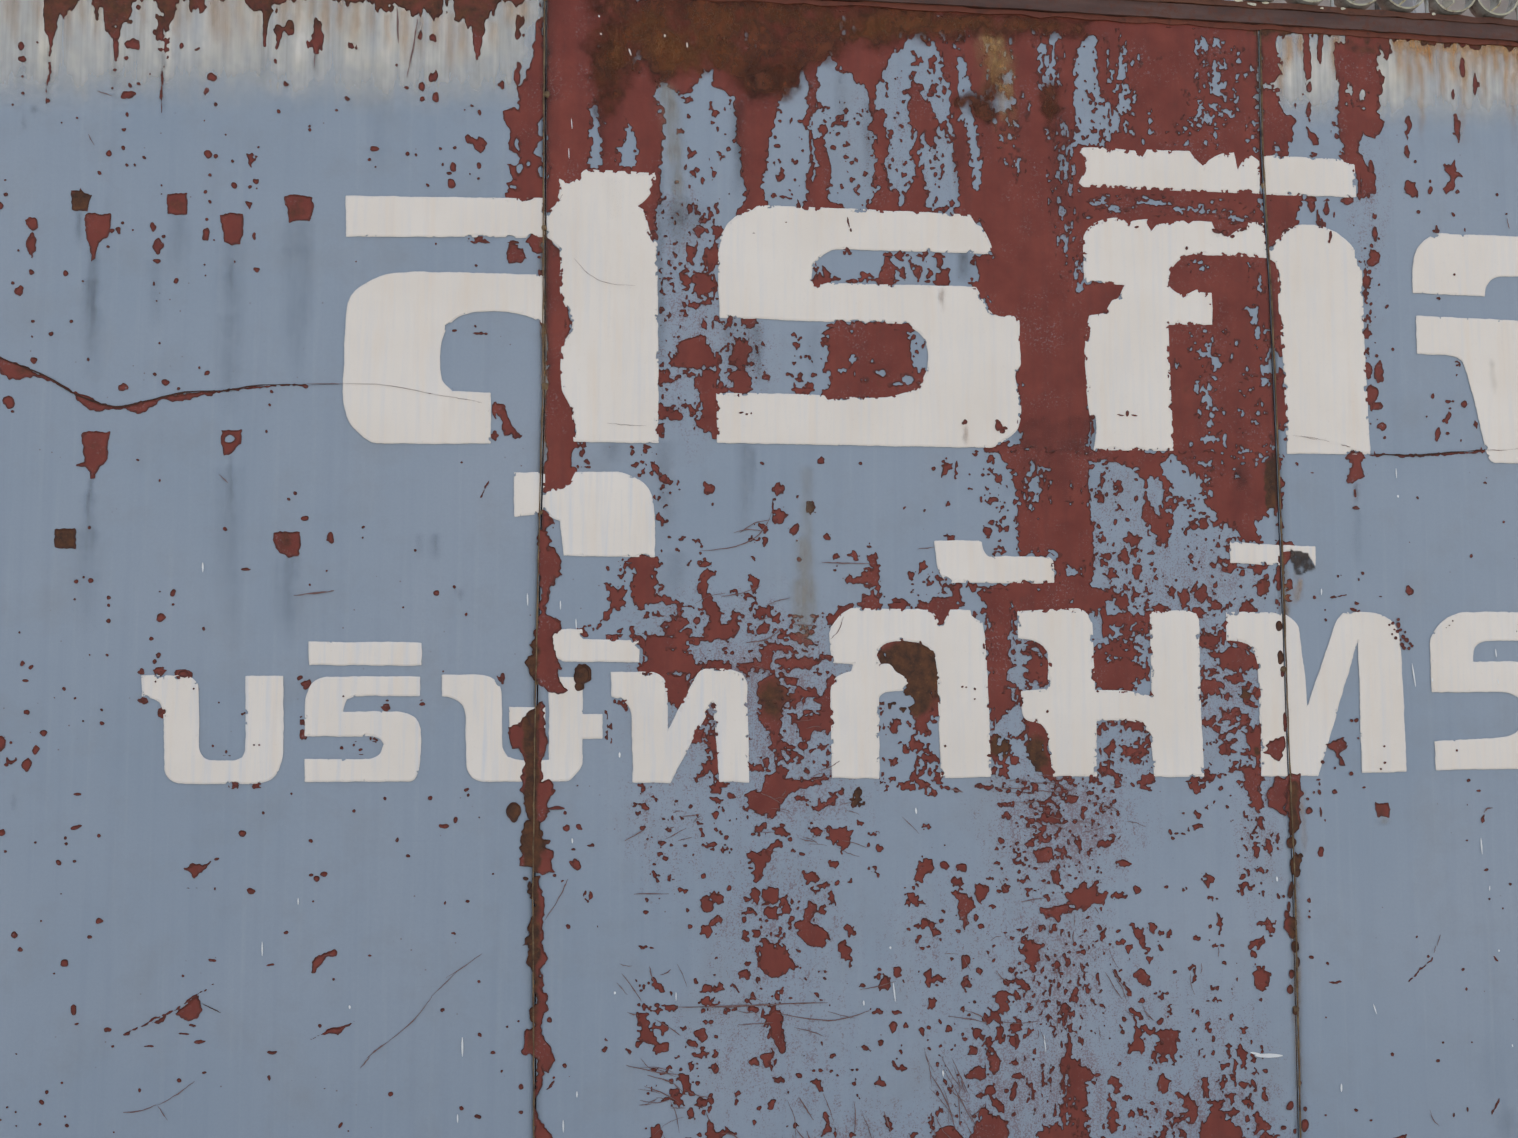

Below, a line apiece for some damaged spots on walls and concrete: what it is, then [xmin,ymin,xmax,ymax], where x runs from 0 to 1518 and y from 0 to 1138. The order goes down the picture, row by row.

peeling [11,0,225,175]
peeling [245,0,324,66]
corrosion [591,0,1087,111]
corrosion [956,85,997,123]
corrosion [1040,84,1060,118]
peeling [71,146,260,264]
peeling [284,194,314,223]
crack [0,356,337,414]
peeling [76,431,110,479]
peeling [273,516,309,558]
peeling [333,0,1486,1138]
peeling [137,589,195,718]